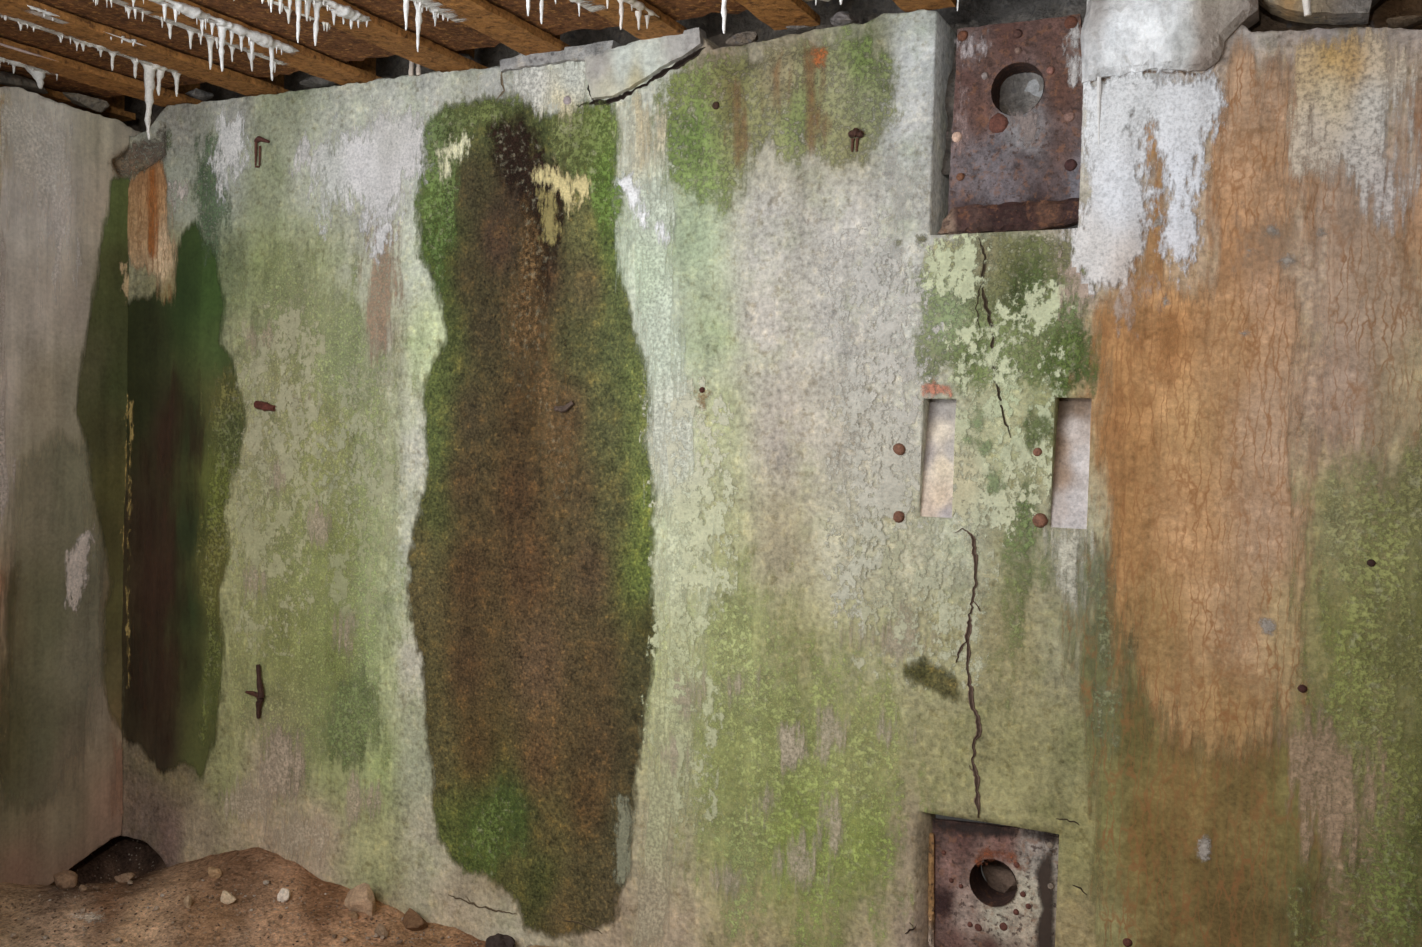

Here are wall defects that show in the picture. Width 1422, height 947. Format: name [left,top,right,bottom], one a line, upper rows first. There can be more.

leakage [0,43,80,523]
leakage [1,5,181,140]
corrosion [127,160,177,303]
leakage [93,0,371,81]
leakage [76,105,443,778]
leakage [403,0,464,52]
crack [975,237,1011,438]
leakage [1059,69,1226,336]
corrosion [1093,38,1422,763]
crack [956,528,982,818]
leakage [1043,529,1326,947]
corrosion [932,819,1056,947]